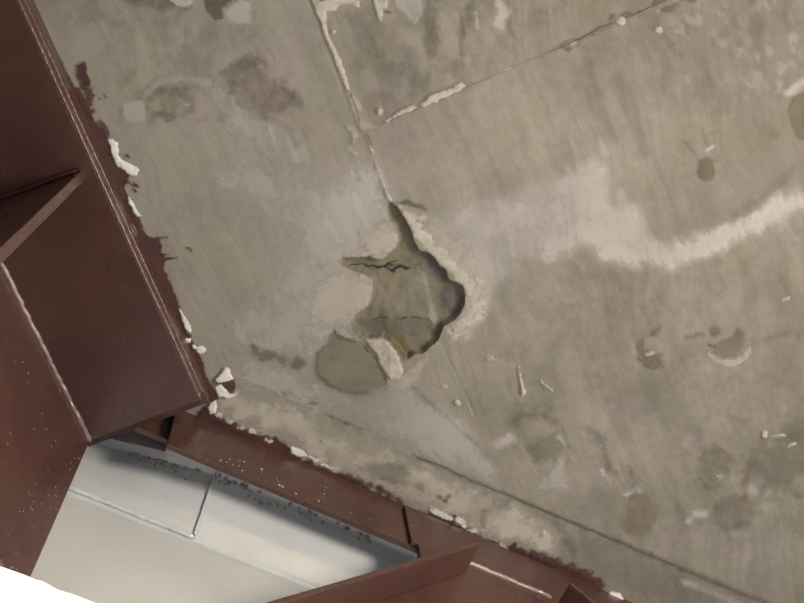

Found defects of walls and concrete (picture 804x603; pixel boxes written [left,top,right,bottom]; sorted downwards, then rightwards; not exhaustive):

peeling [205,0,250,23]
damp [123,100,145,123]
damp [789,93,804,138]
damp [698,146,715,181]
crack [349,260,411,273]
damp [398,161,804,342]
spalling [316,201,466,394]
damp [214,66,568,553]